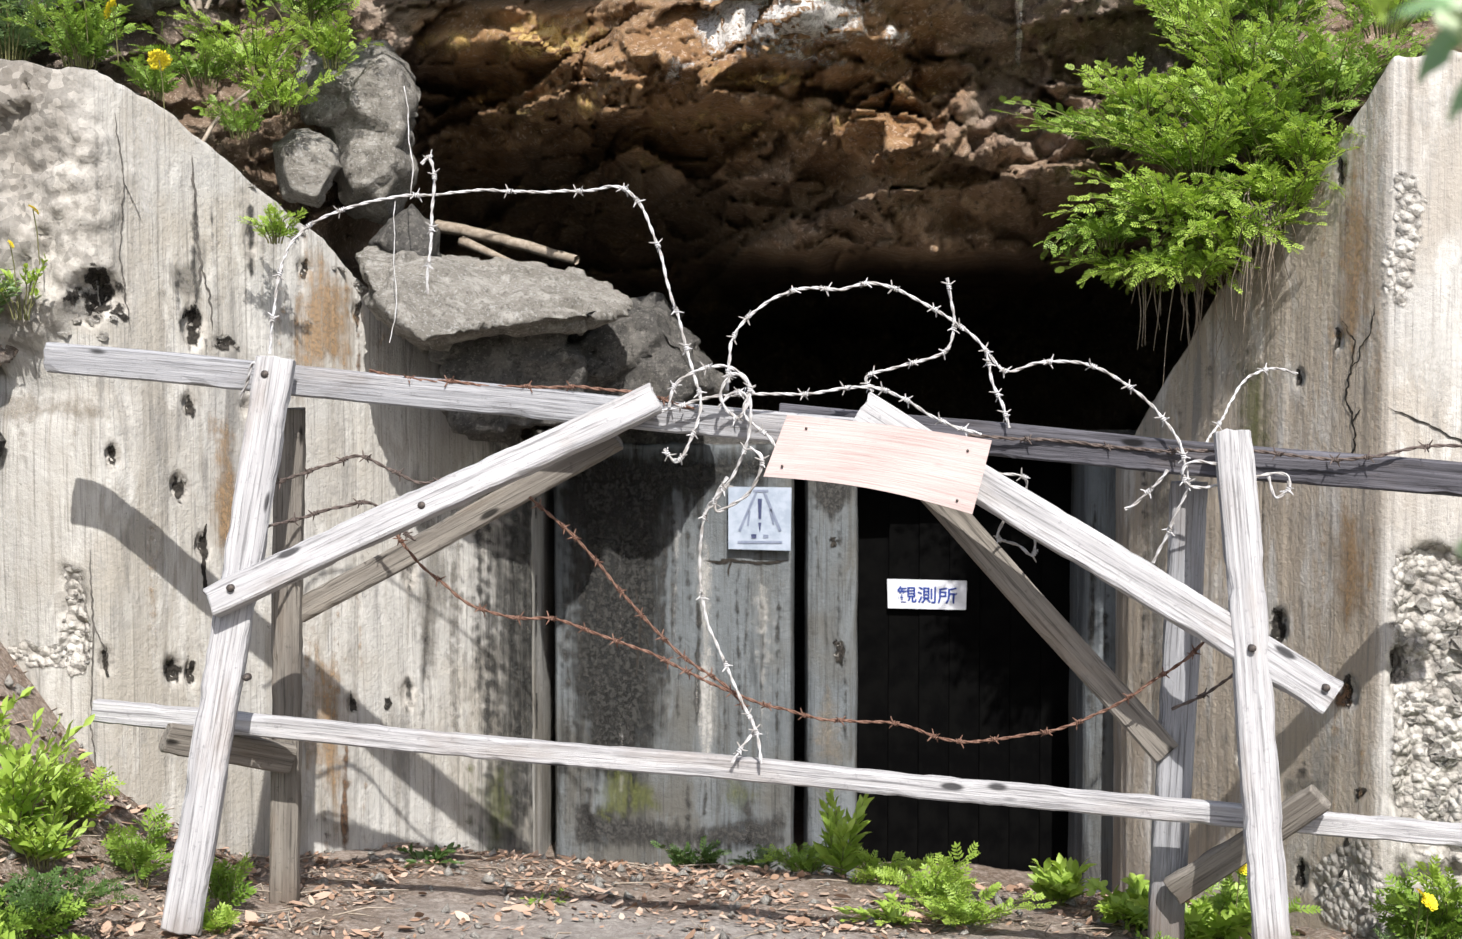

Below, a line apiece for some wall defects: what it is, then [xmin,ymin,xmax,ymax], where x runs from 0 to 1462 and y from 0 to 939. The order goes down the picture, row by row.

spalling [57,263,130,341]
corrosion [282,261,360,368]
crack [1342,303,1462,453]
spalling [6,563,109,677]
leakage [406,497,538,739]
leakage [561,450,772,749]
spalling [1390,542,1462,823]
leakage [486,760,533,849]
leakage [565,768,784,851]
spalling [1411,843,1462,863]